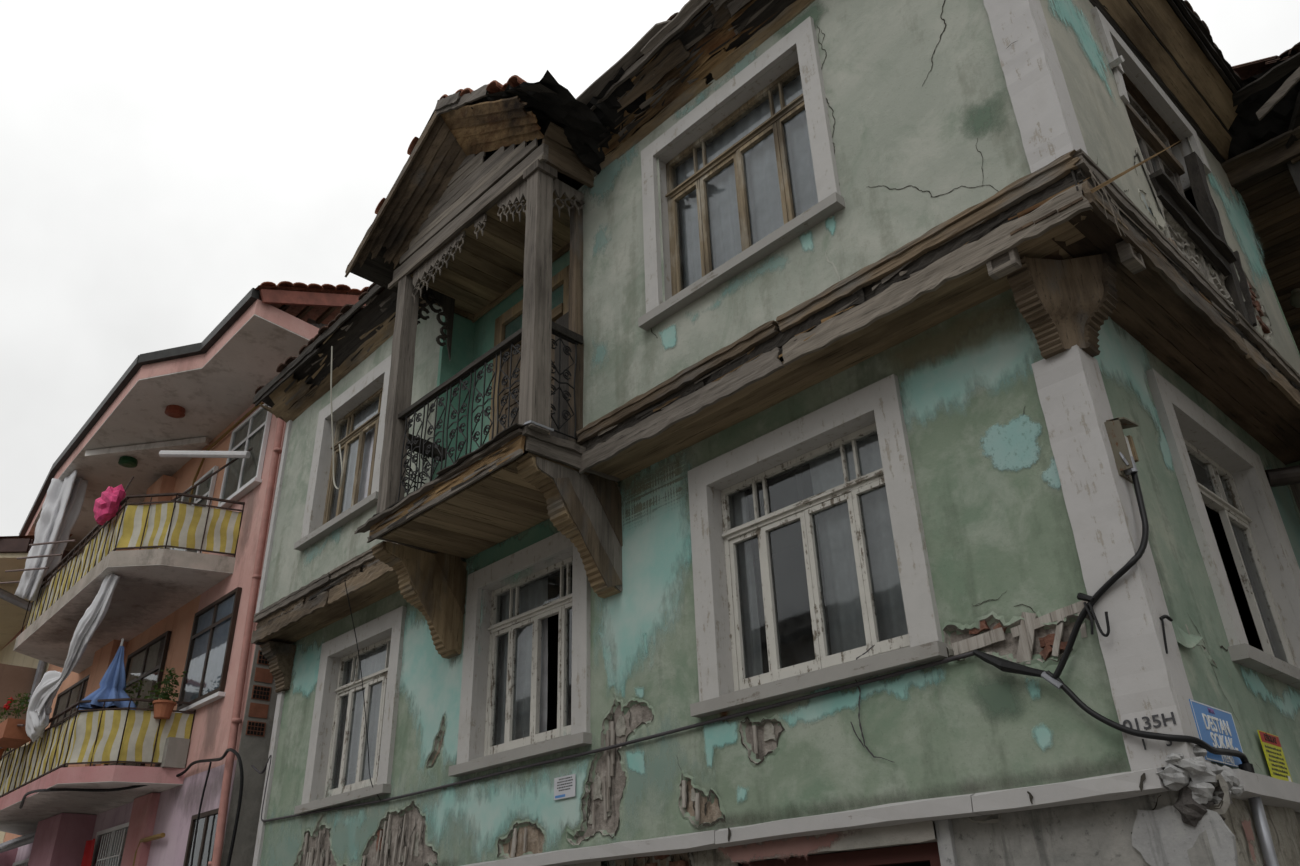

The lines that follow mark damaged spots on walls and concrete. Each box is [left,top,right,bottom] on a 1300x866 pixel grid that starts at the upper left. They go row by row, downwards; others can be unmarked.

crack [922,0,946,86]
peeling [1049,0,1112,96]
crack [817,26,835,155]
crack [868,138,999,197]
peeling [981,415,1061,490]
spalling [247,722,265,736]
spalling [253,686,270,700]
peeling [292,453,695,866]
flaking render [704,600,1095,768]
flaking render [677,769,747,830]
peeling [718,832,845,863]